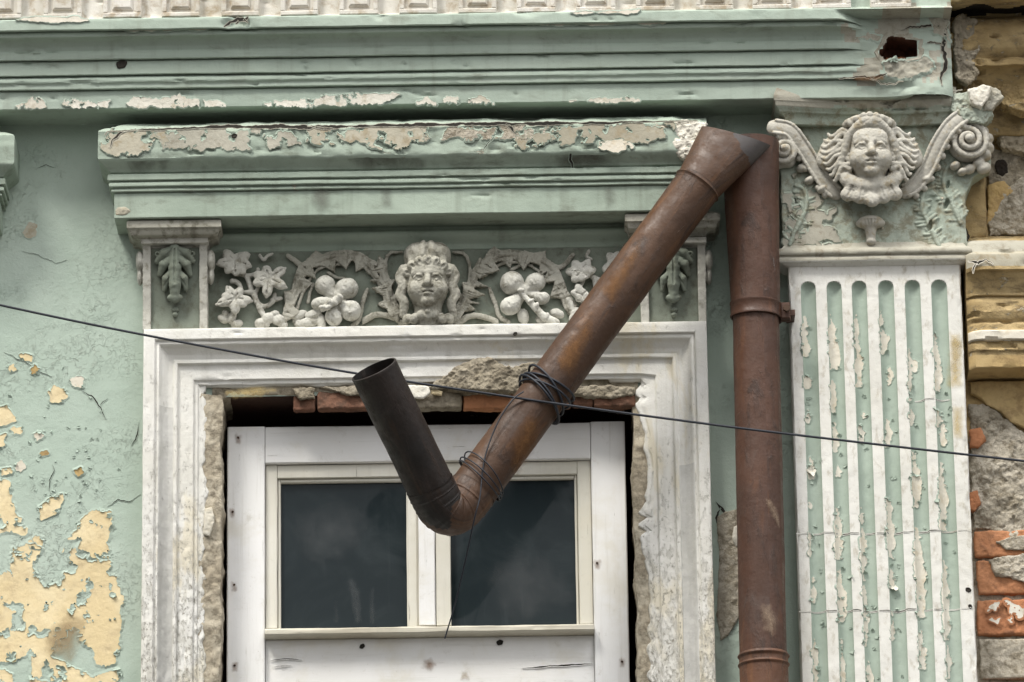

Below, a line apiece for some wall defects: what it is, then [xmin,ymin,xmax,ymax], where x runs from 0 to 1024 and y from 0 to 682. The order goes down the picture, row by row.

peeling [61,98,112,110]
peeling [126,92,227,110]
peeling [263,91,402,109]
peeling [99,119,708,162]
crack [839,19,962,96]
peeling [855,13,1024,127]
spalling [408,357,536,416]
peeling [0,367,126,682]
spalling [197,385,367,682]
spalling [565,379,651,682]
peeling [806,451,956,682]
spalling [968,404,1024,681]